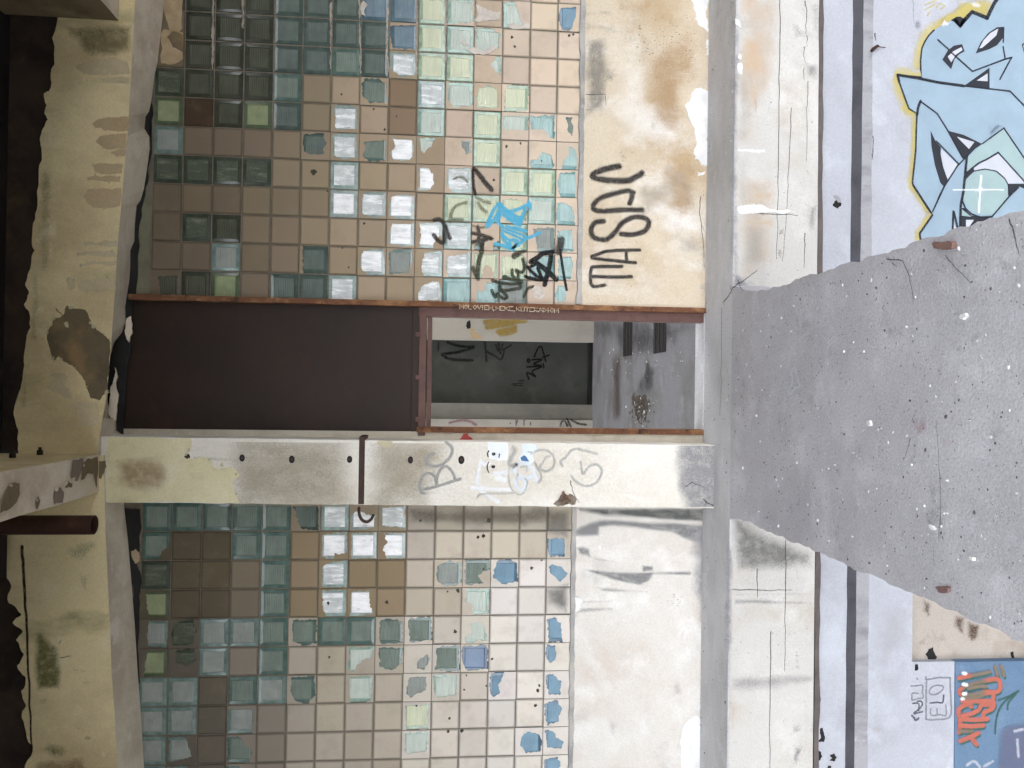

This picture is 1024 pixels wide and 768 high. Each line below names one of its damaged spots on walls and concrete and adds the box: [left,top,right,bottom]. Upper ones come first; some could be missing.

peeling [692,0,709,55]
damp [584,1,708,144]
peeling [685,88,708,176]
peeling [46,102,239,683]
peeling [0,482,20,513]
spalling [915,647,937,671]